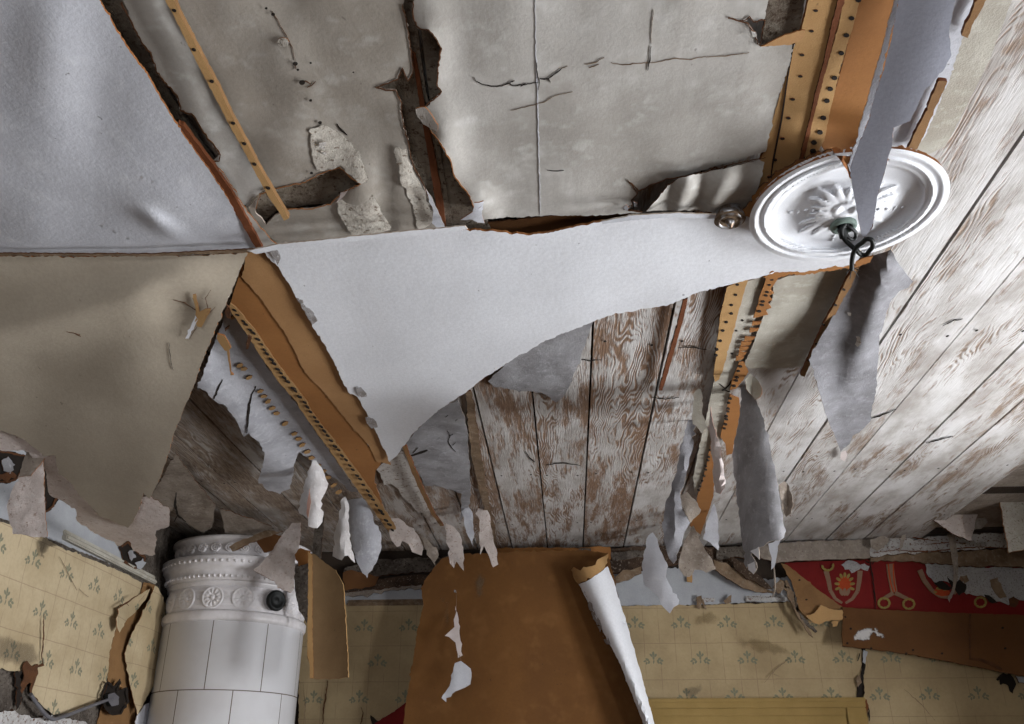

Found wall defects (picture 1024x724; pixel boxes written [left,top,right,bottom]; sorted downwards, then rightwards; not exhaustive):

crack [475,1,749,202]
peeling [309,125,368,184]
peeling [394,147,433,229]
peeling [337,195,391,235]
peeling [297,298,317,324]
peeling [842,560,869,573]
peeling [925,563,1024,607]